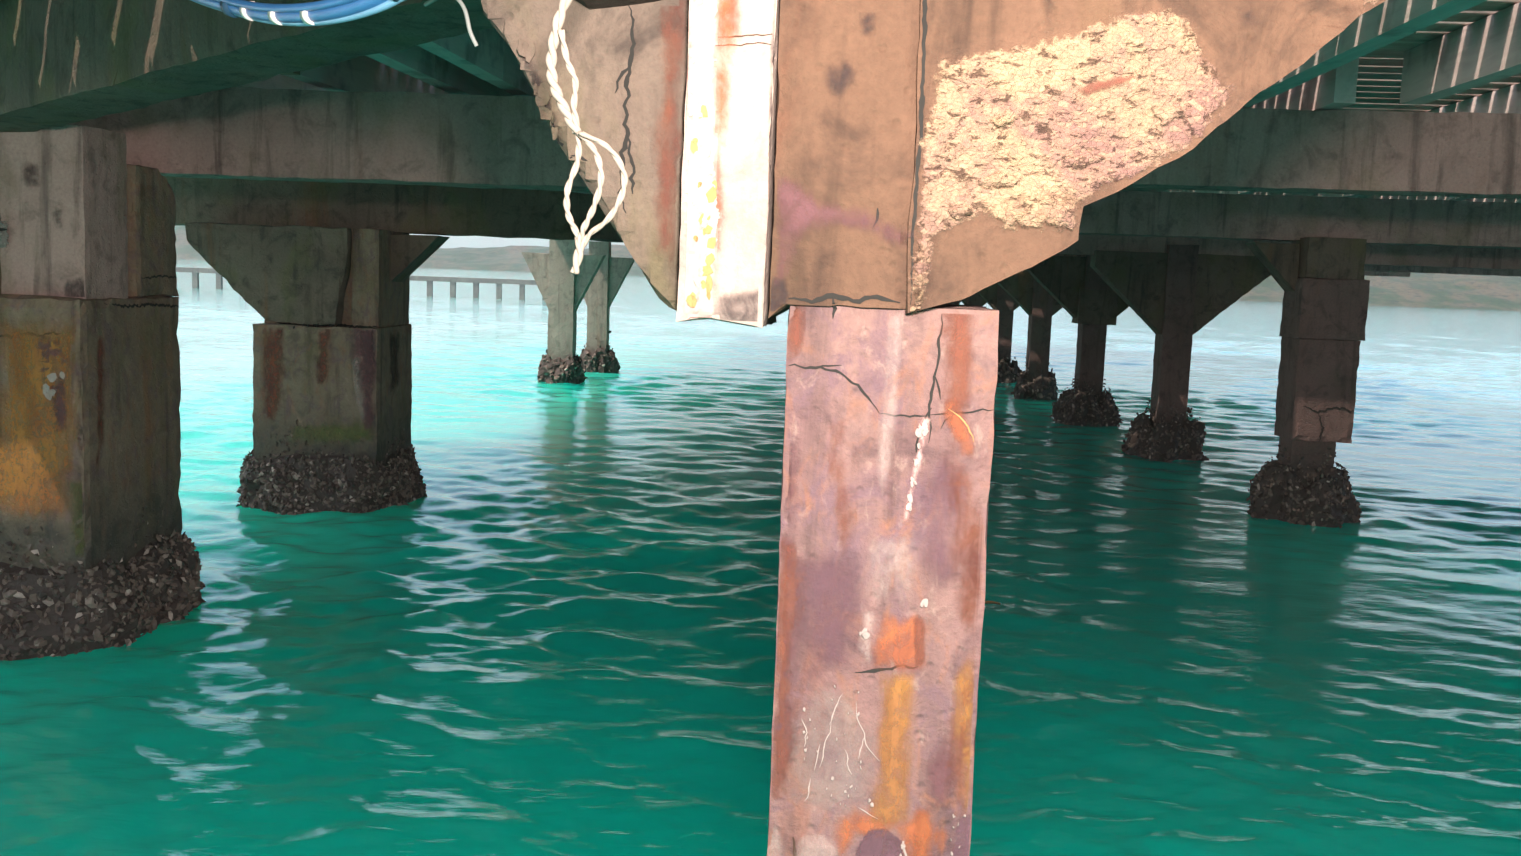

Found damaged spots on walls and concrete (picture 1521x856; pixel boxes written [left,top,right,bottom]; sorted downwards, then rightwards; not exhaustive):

crack [552,6,636,213]
peeling [684,0,722,320]
crack [788,0,991,458]
spalling [908,9,1233,315]
rust [0,324,75,514]
rust [264,329,284,419]
crack [1303,406,1354,441]
rust [840,619,944,856]